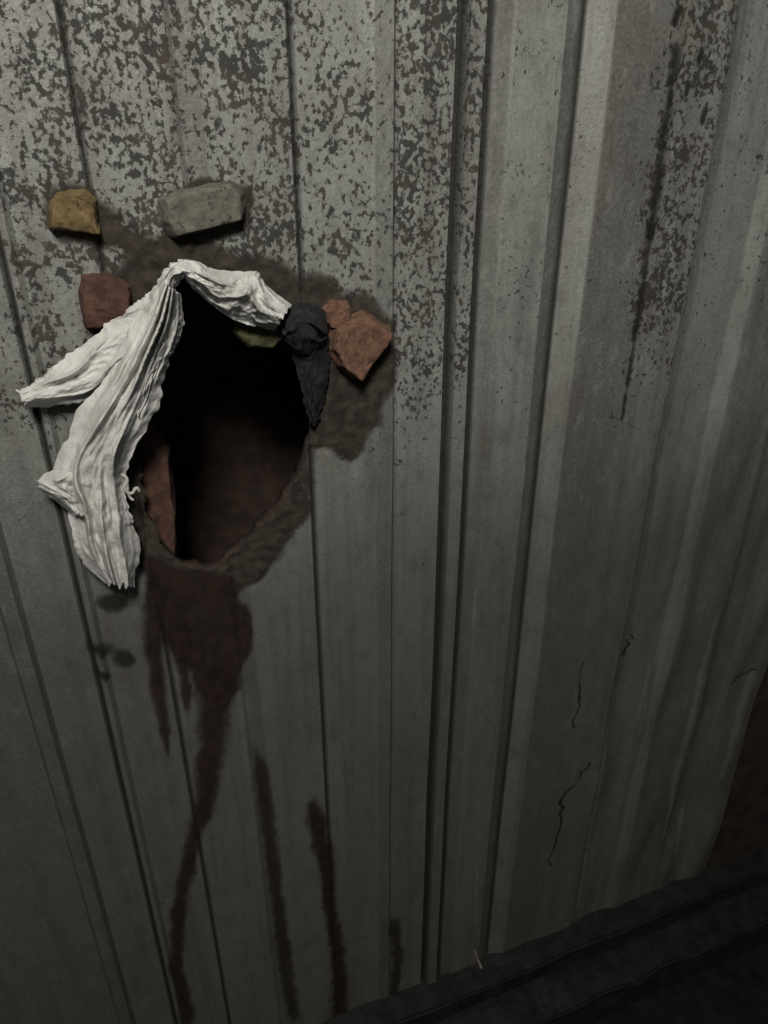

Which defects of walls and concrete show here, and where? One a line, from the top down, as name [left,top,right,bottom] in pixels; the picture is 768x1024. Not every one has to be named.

rust [621,45,691,420]
rust [139,558,252,1024]
rust [255,757,298,1020]
rust [309,802,347,1017]
crack [549,762,591,866]
crack [572,660,585,729]